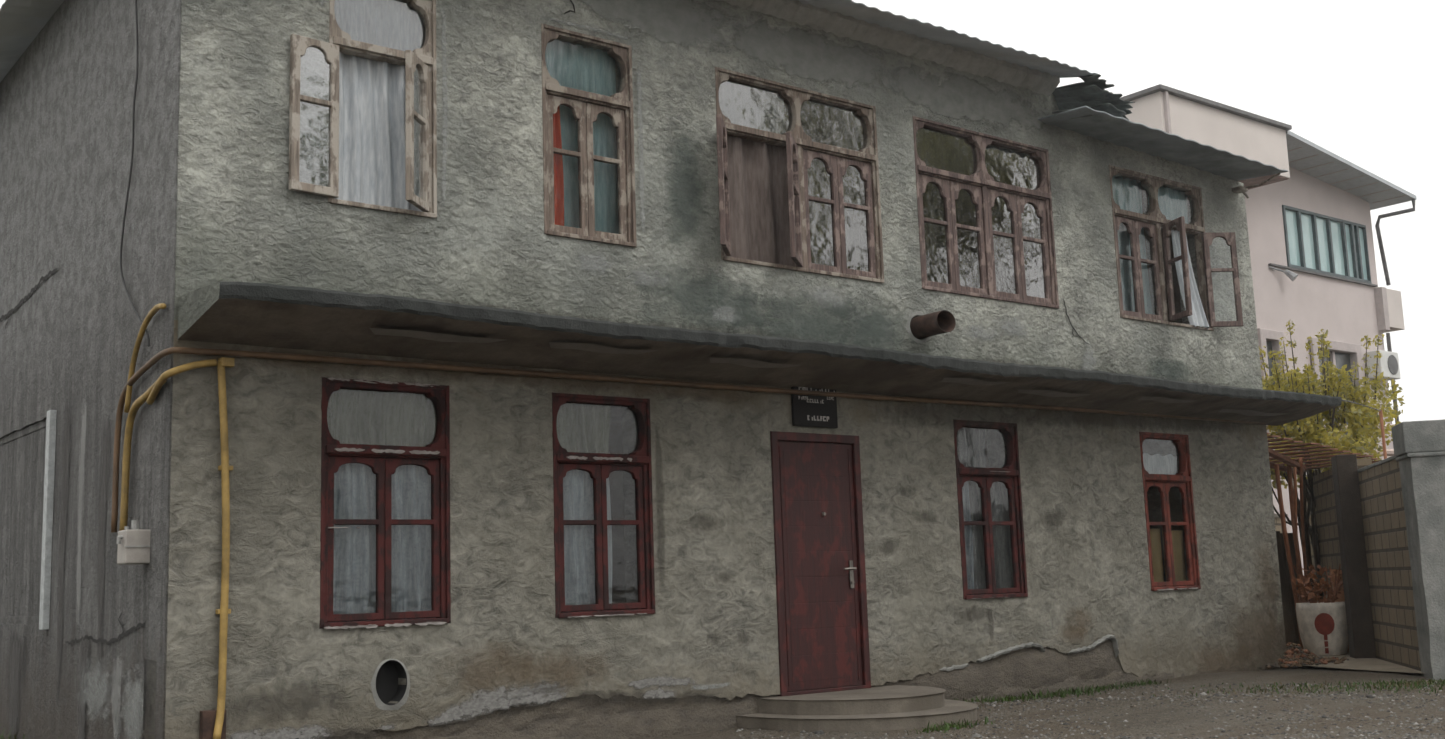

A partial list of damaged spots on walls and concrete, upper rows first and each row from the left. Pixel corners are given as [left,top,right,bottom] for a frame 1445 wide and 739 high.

spalling [914,635,1119,701]
peeling [428,680,566,725]
peeling [231,725,330,739]